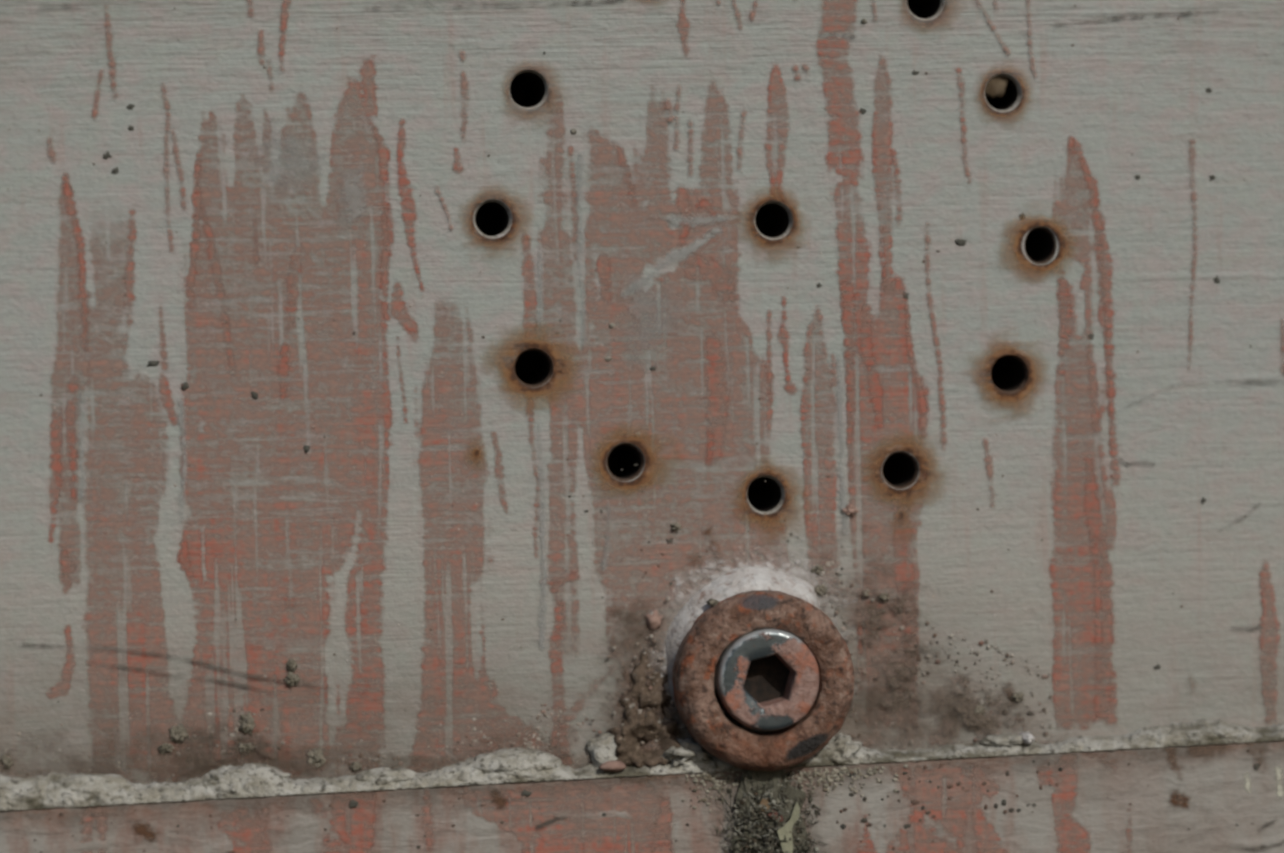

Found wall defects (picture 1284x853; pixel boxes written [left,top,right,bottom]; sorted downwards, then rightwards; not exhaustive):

corrosion [1008,217,1070,276]
peeling [47,0,946,782]
corrosion [495,332,571,399]
corrosion [978,343,1041,408]
peeling [1050,137,1120,729]
corrosion [871,438,937,519]
peeling [311,791,376,853]
peeling [759,798,800,853]